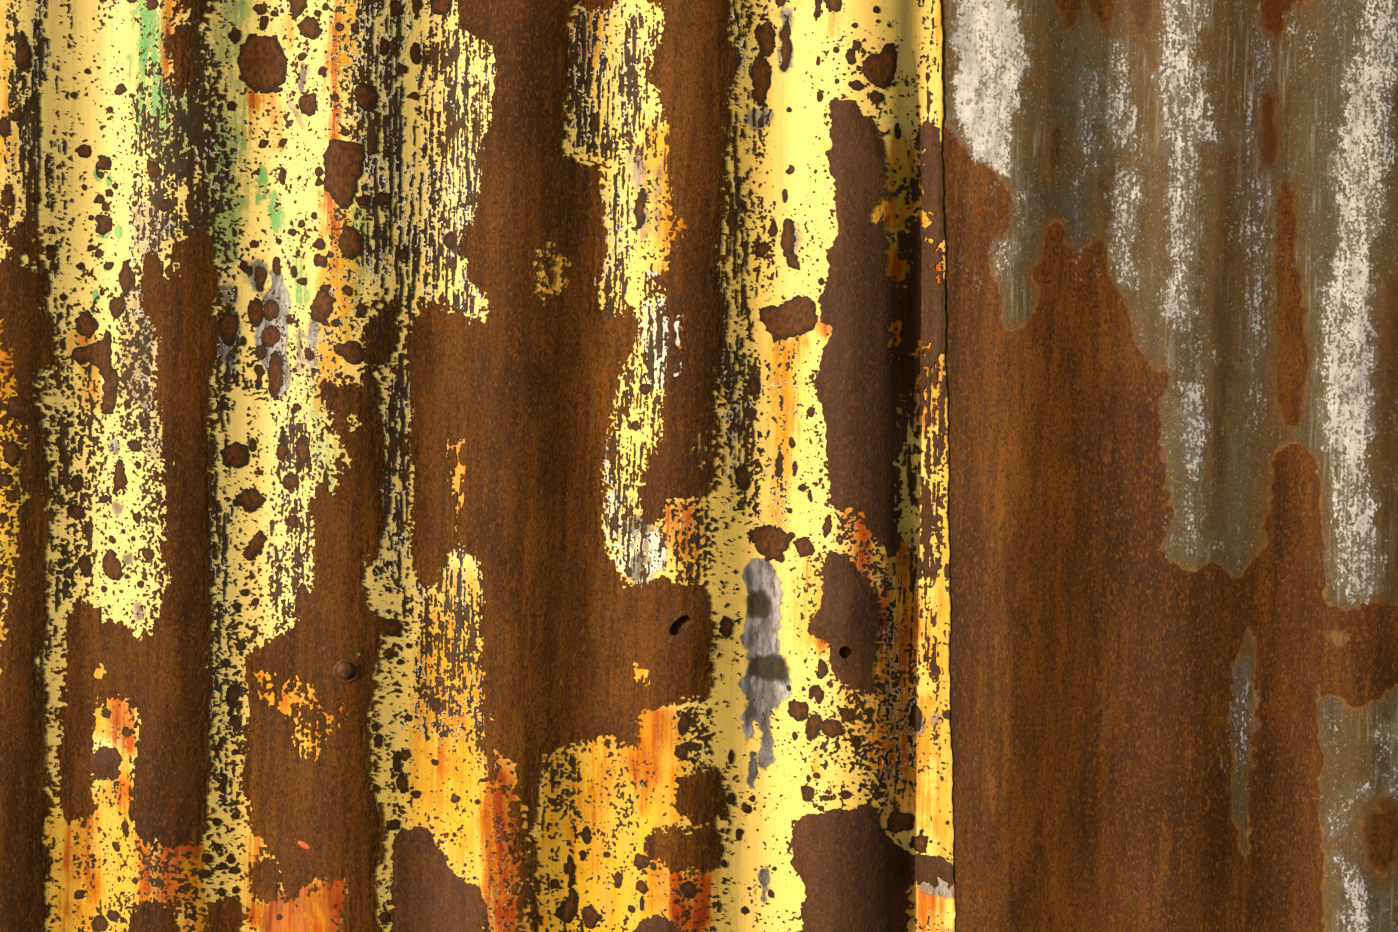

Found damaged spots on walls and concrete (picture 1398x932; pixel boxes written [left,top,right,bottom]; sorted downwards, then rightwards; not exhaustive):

rust [0,0,775,932]
peeling [0,0,954,932]
rust [746,43,1398,932]